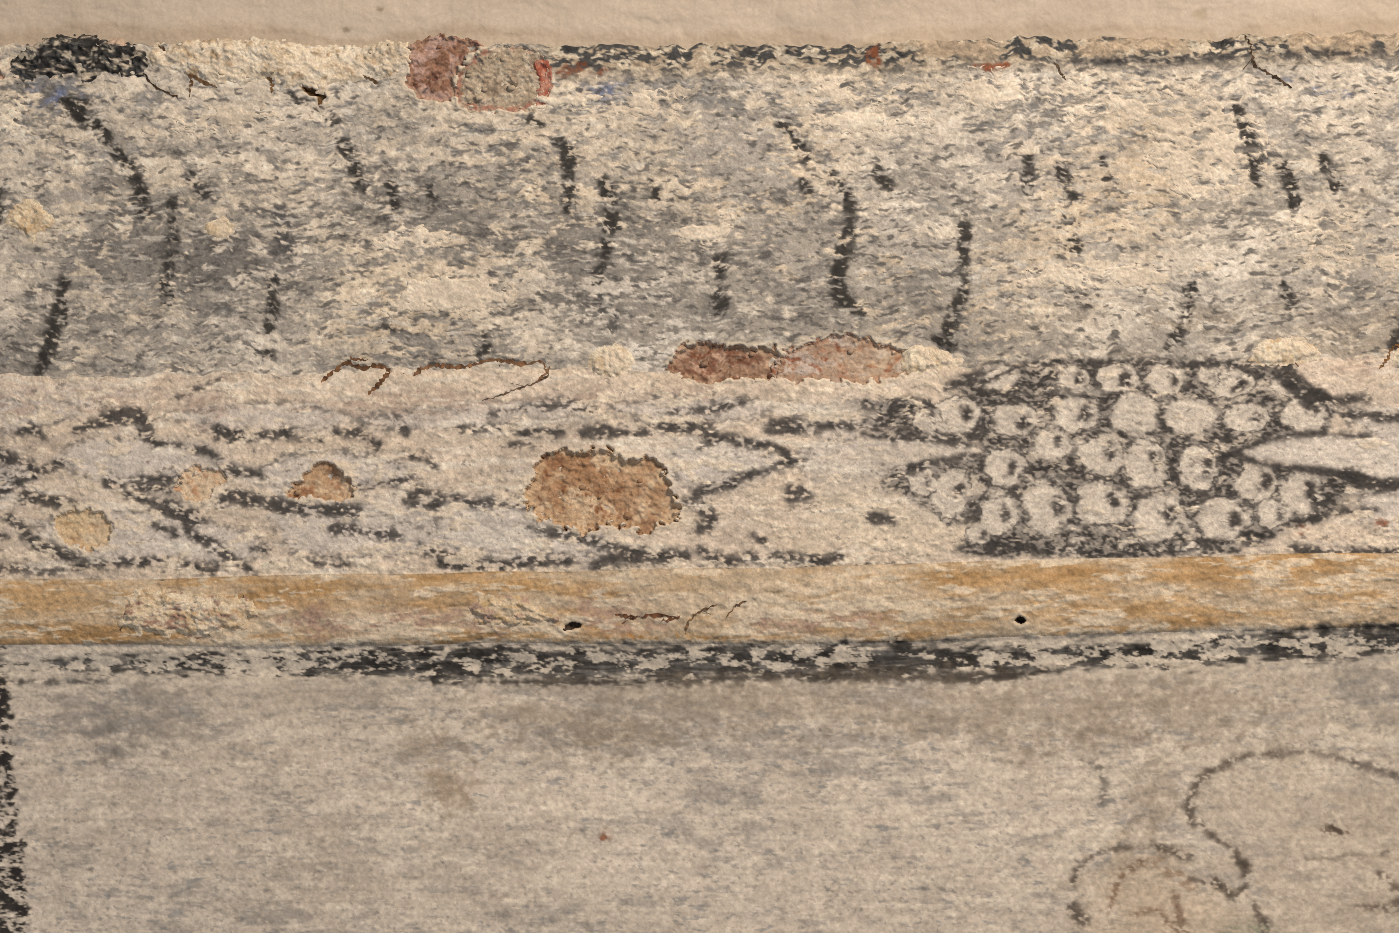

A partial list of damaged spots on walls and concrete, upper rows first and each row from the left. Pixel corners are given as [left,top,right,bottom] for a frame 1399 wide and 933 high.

flaking render [0,33,484,133]
peeling [141,102,280,141]
flaking render [665,333,909,385]
flaking render [286,461,357,502]
flaking render [523,446,683,537]